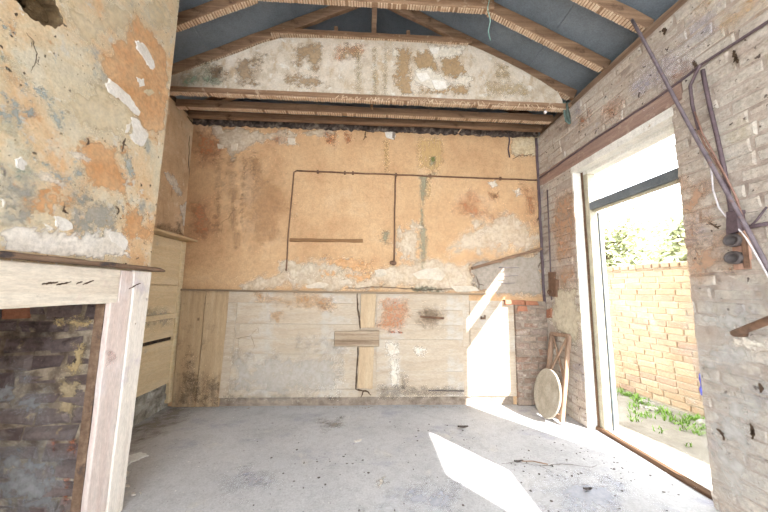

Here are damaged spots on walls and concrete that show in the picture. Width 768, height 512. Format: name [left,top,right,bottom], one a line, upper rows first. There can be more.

flaking render [15,0,63,29]
peeling [428,44,465,58]
peeling [102,15,169,147]
peeling [413,68,472,91]
peeling [241,255,479,293]
leakage [423,310,438,323]
crack [355,347,371,397]
leakage [136,361,219,440]